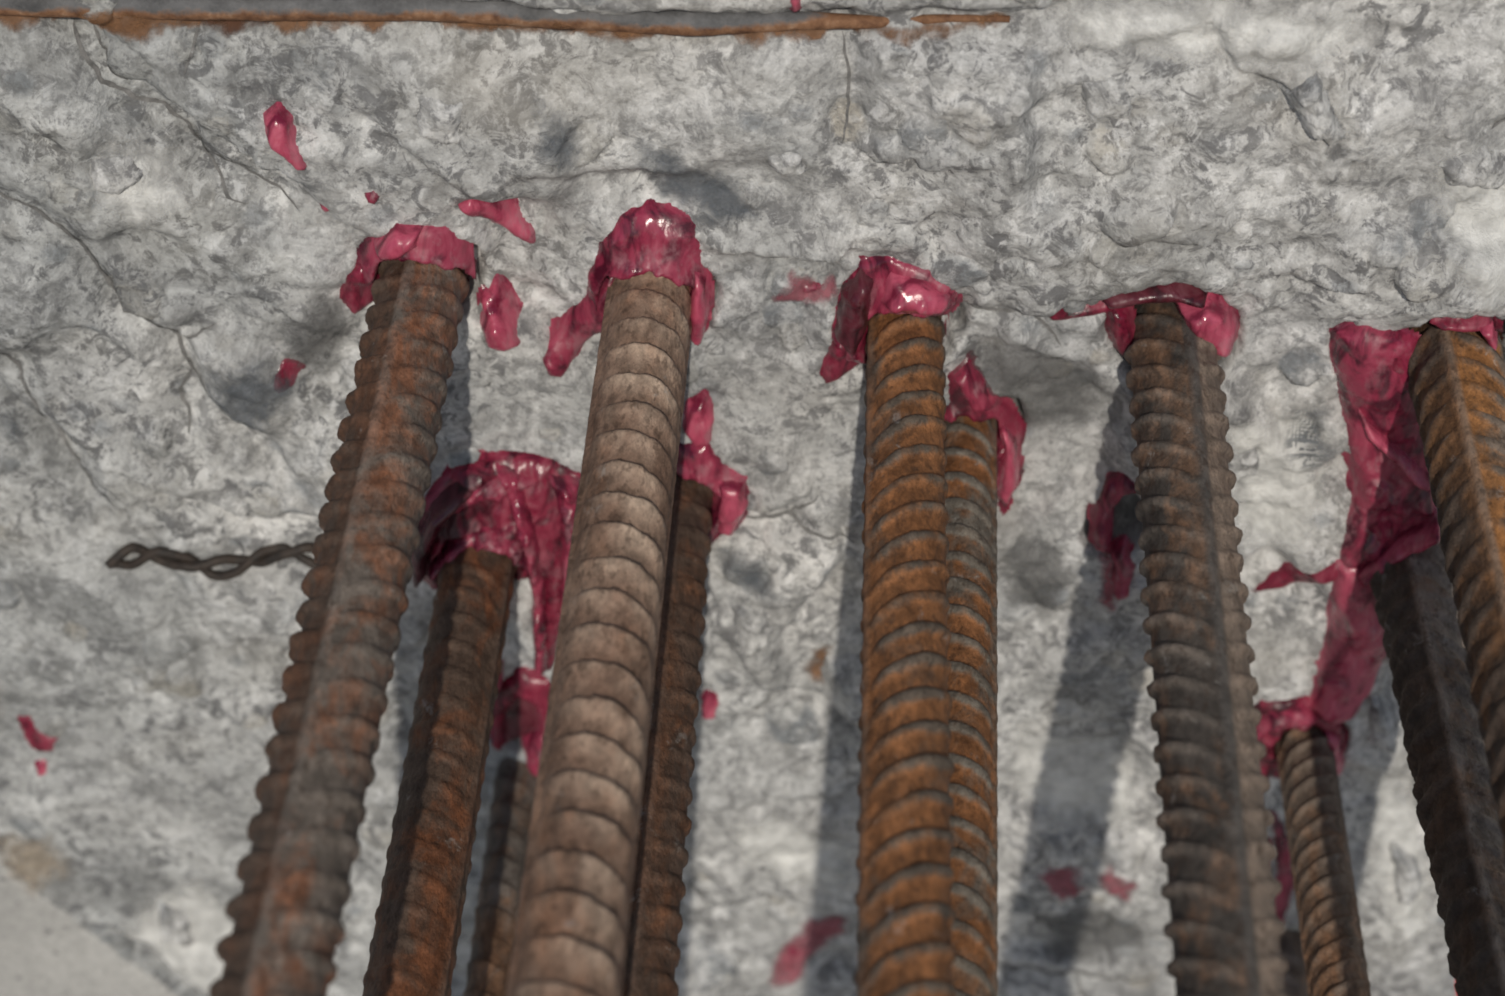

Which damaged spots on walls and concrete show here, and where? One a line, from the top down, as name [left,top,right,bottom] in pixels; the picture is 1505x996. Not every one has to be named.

rust [77,11,388,40]
rust [443,22,651,39]
spalling [507,0,792,16]
rust [733,30,826,44]
rust [854,13,1006,44]
crack [73,18,298,209]
spalling [417,95,463,145]
crack [0,191,269,440]
crack [0,353,123,513]
spalling [502,578,553,681]
spalling [327,577,437,996]
spalling [1338,656,1457,996]